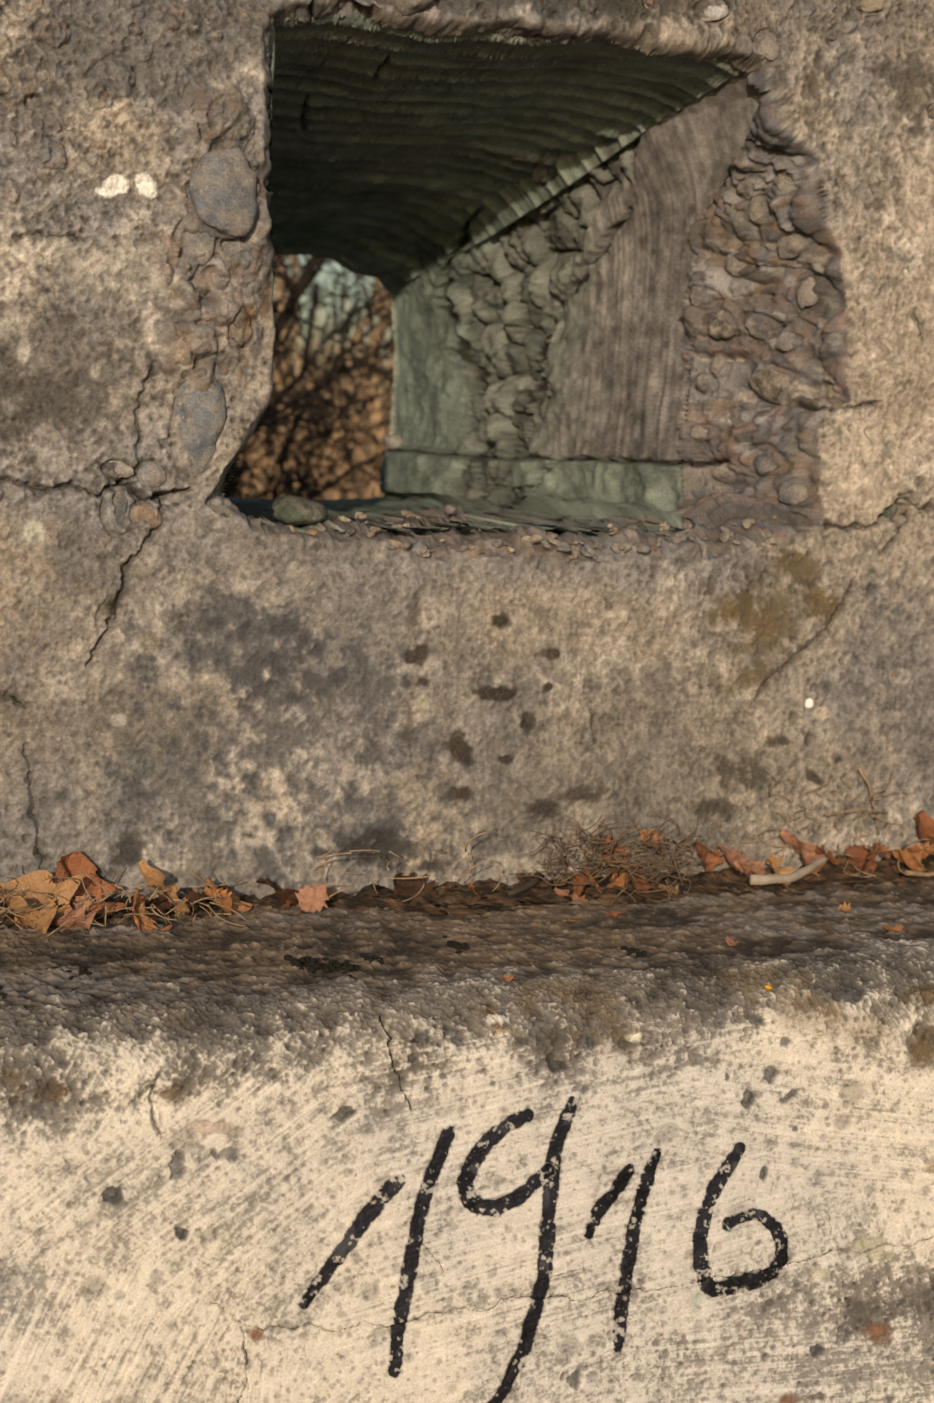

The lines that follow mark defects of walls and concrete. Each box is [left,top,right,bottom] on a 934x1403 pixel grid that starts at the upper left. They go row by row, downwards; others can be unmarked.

crack [89,482,185,660]
crack [825,497,934,545]